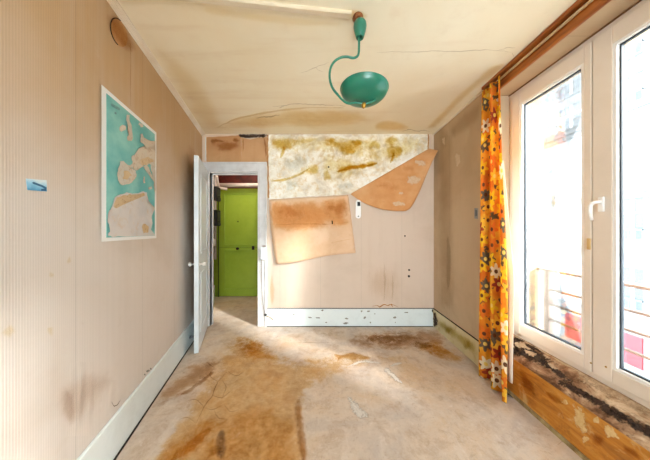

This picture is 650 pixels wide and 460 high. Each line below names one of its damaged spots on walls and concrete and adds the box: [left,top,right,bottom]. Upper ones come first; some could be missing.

flaking render [266,134,429,199]
damp [513,337,650,437]
peeling [561,400,619,443]